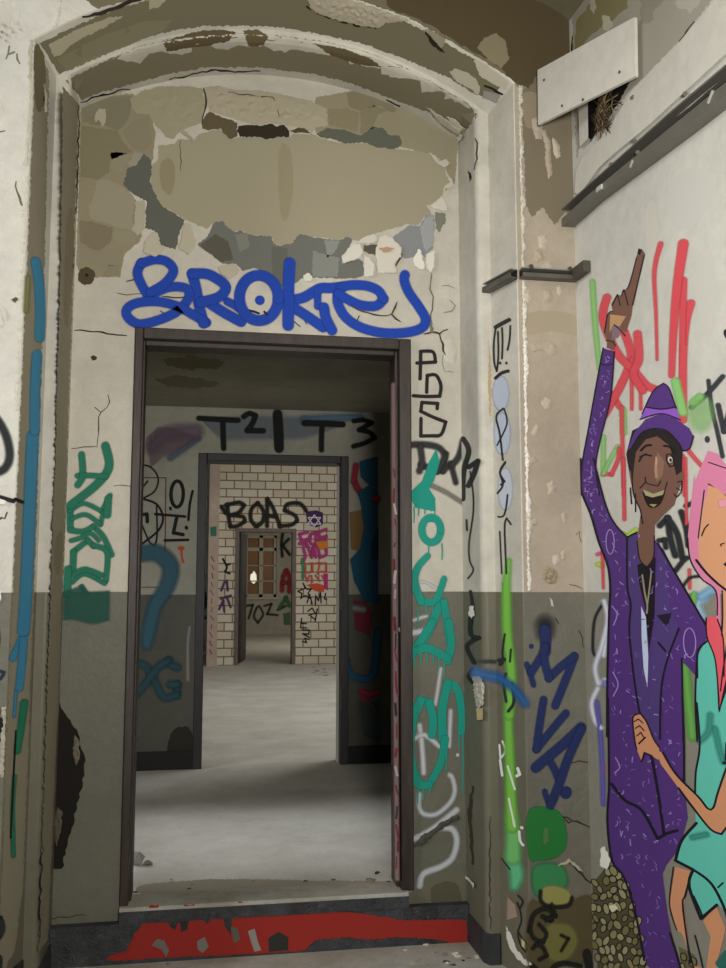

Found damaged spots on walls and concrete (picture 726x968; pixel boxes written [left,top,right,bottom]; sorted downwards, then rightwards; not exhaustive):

spalling [49,16,122,57]
spalling [308,0,409,28]
spalling [424,29,445,53]
spalling [11,39,48,308]
spalling [79,85,453,287]
peeling [426,107,466,143]
spalling [450,59,526,267]
spalling [14,324,22,411]
spalling [522,280,558,591]